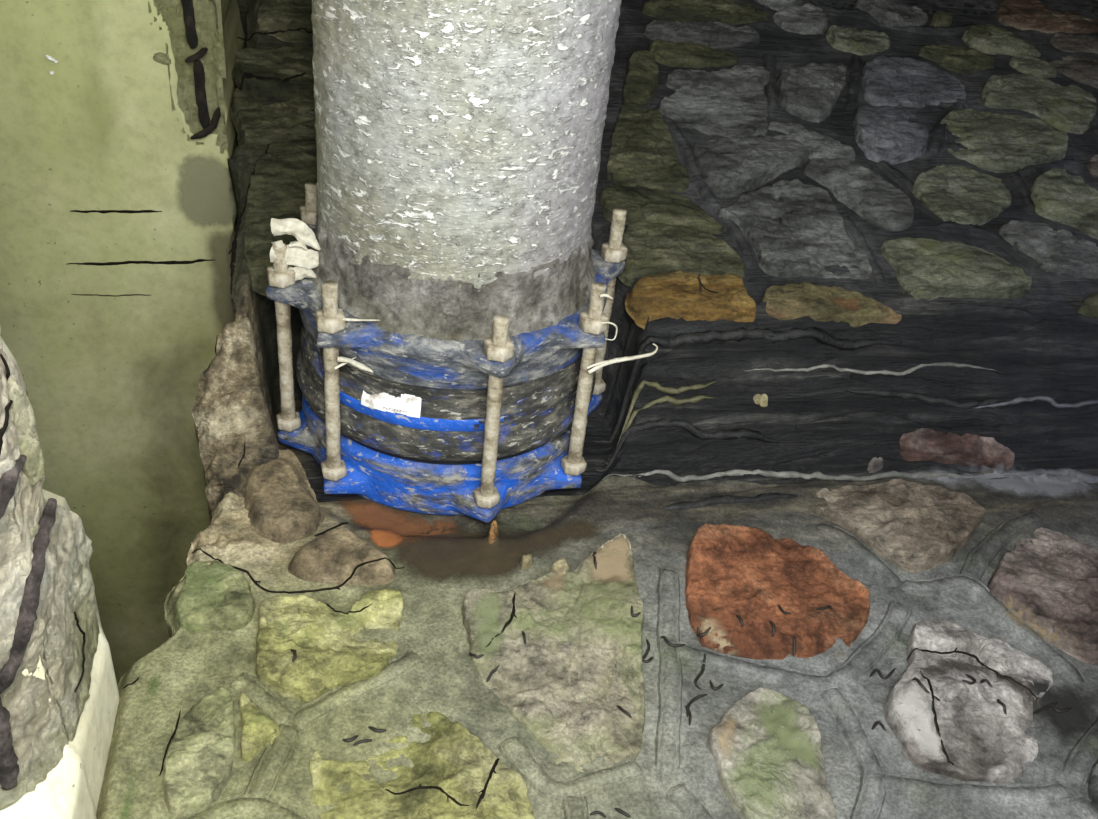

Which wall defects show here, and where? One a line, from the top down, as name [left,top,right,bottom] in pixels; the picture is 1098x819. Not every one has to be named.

crack [237,28,313,41]
crack [238,72,306,90]
crack [68,144,270,295]
crack [71,291,148,299]
crack [0,354,13,455]
crack [192,549,405,614]
crack [315,522,348,536]
rust [345,503,454,547]
leakage [398,523,596,580]
leakage [590,535,631,582]
crack [907,648,1038,766]
crack [385,758,499,809]